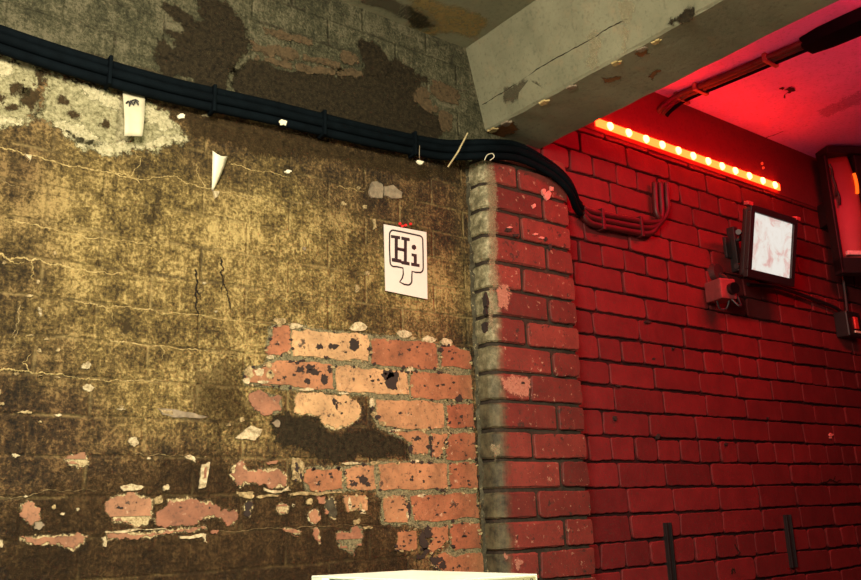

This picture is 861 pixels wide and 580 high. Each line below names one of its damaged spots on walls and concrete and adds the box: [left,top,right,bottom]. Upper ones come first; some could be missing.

leakage [361,0,487,37]
leakage [154,0,444,139]
peeling [0,54,188,157]
peeling [73,361,95,392]
spalling [64,452,89,469]
spalling [101,318,484,572]
leakage [269,410,409,466]
spalling [19,495,88,551]